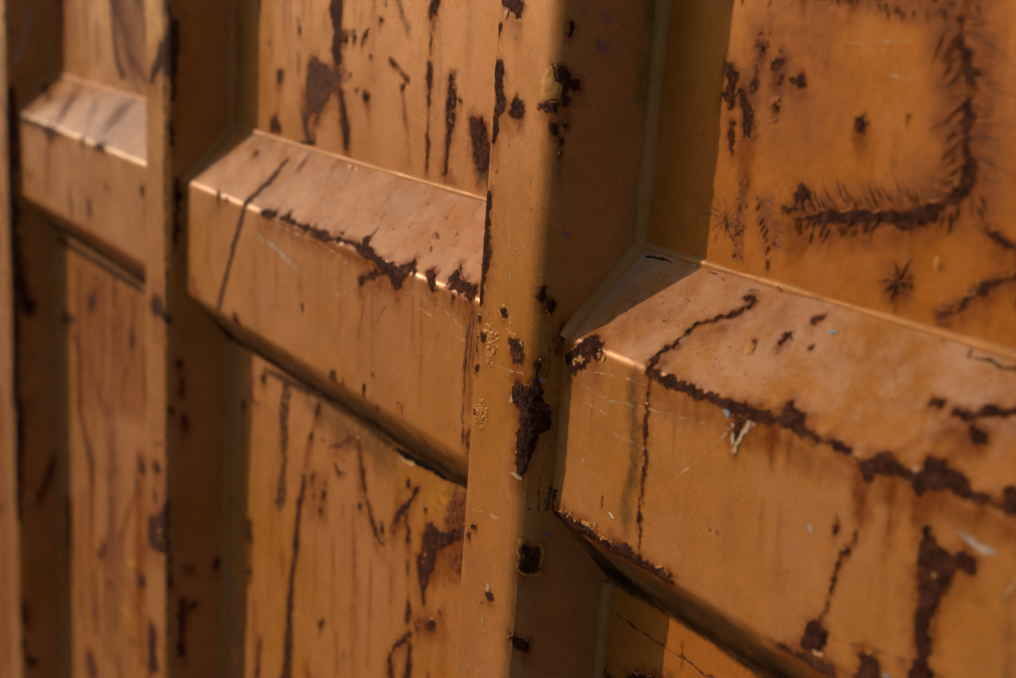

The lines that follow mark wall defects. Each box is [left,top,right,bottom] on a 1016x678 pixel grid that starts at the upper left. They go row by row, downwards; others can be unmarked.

corrosion [302,0,386,151]
corrosion [425,32,433,174]
corrosion [428,0,440,20]
corrosion [442,71,463,177]
corrosion [469,56,585,177]
corrosion [720,31,807,157]
corrosion [781,0,1016,251]
corrosion [260,190,494,374]
corrosion [930,266,1016,322]
corrosion [508,337,553,480]
corrosion [387,478,477,678]
corrosion [650,366,1016,678]